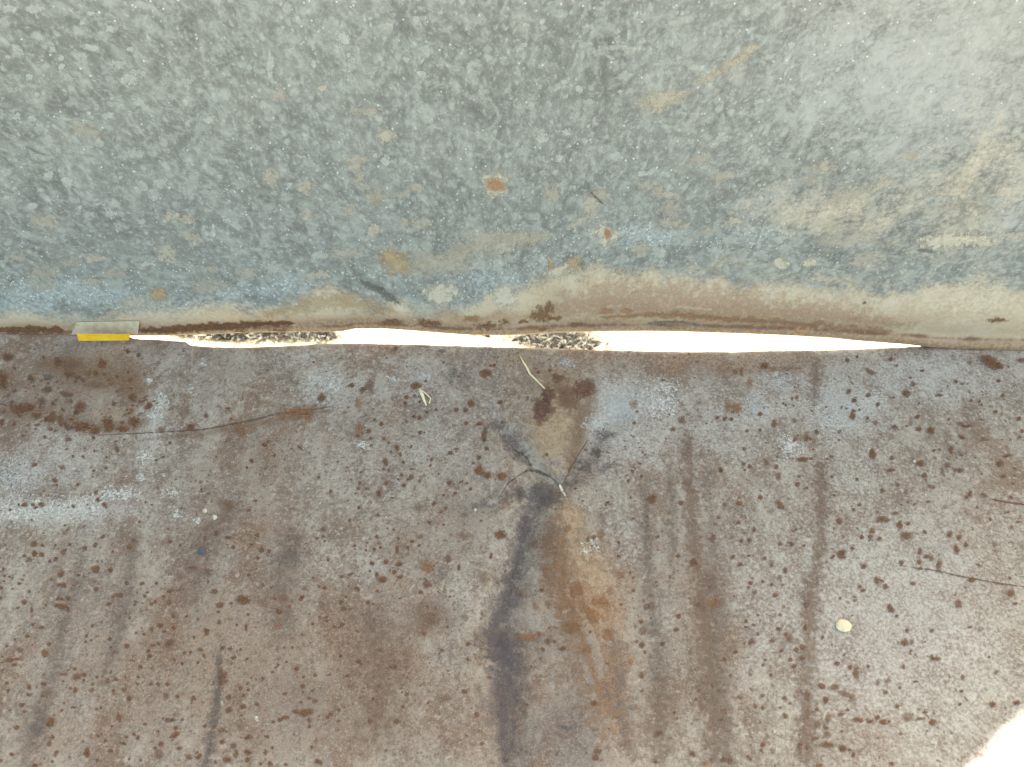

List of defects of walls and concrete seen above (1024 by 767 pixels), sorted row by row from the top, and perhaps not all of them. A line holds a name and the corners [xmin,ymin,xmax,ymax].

damp [379,230,549,312]
damp [513,377,684,508]
corrosion [0,320,1024,767]